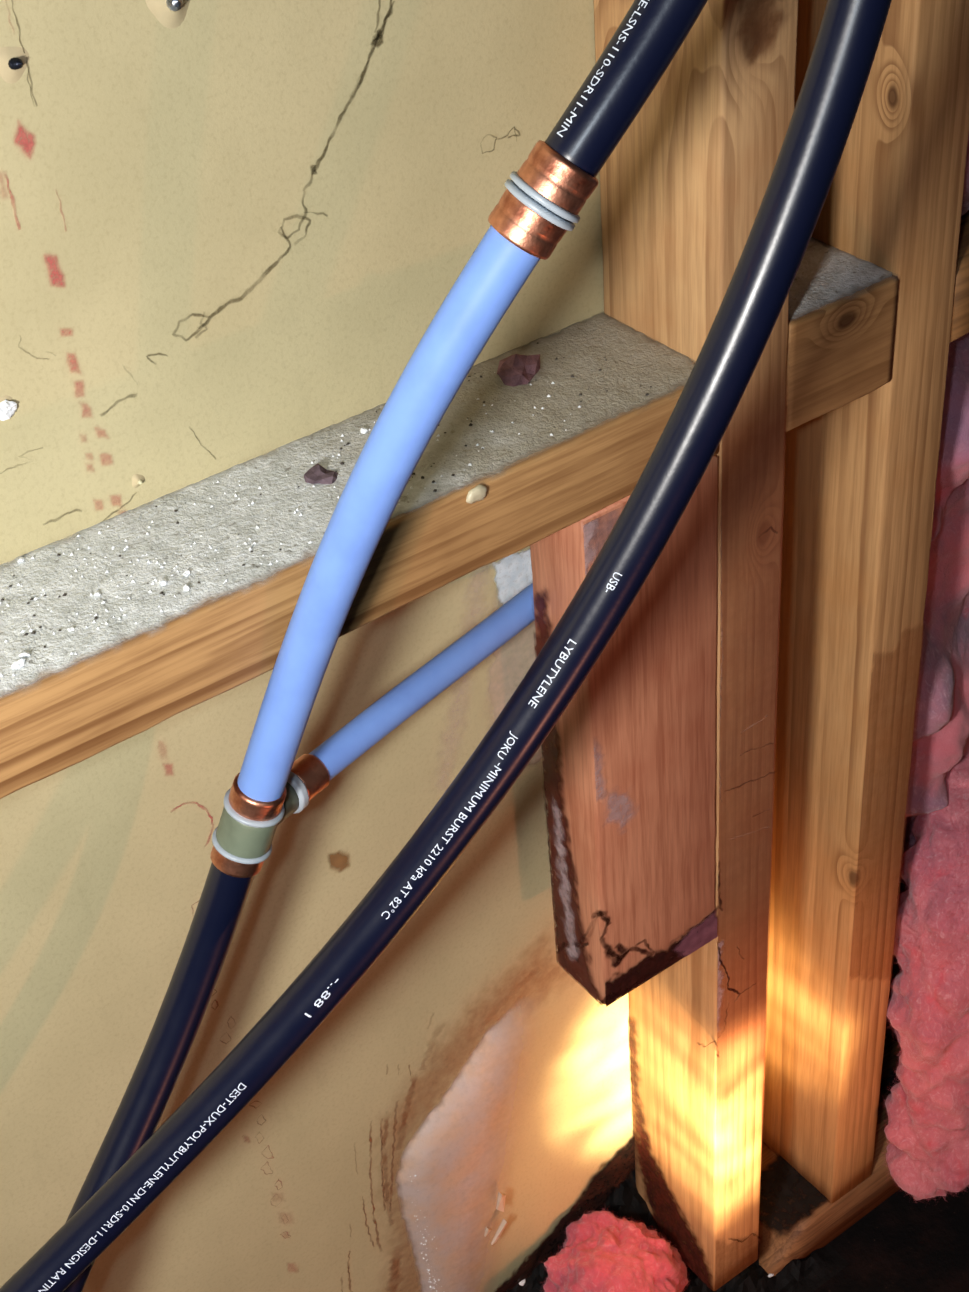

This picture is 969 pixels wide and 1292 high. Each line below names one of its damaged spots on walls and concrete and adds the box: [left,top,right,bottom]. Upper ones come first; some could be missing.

damp [739,0,782,57]
crack [311,0,392,174]
crack [266,203,326,274]
crack [147,298,242,362]